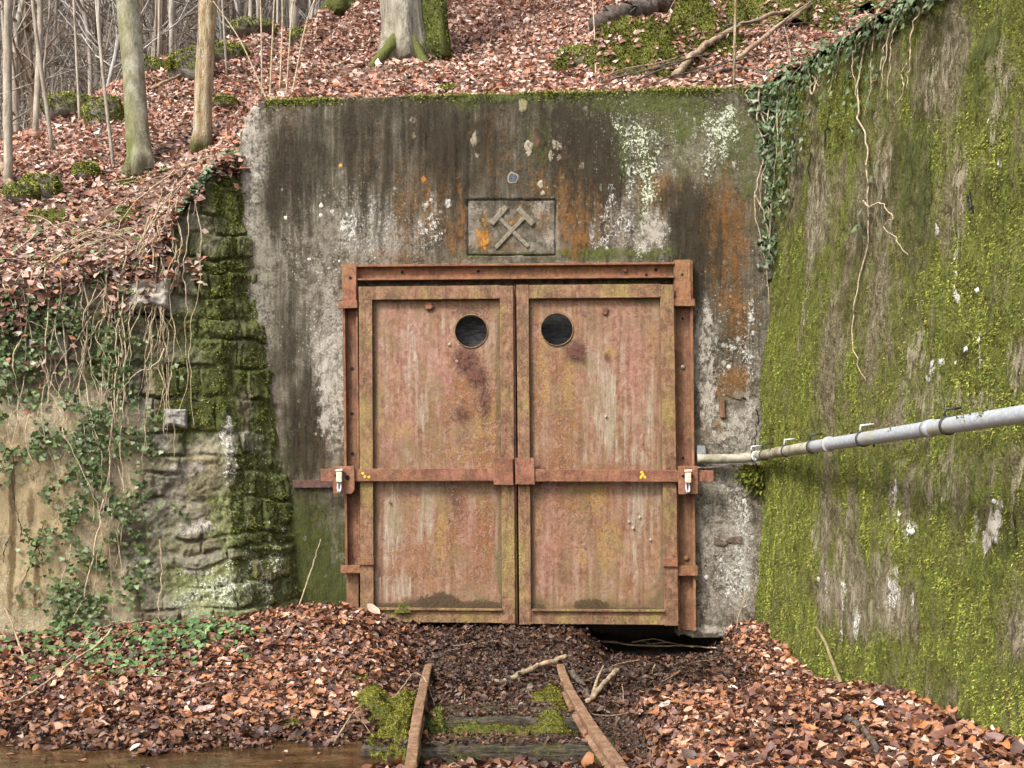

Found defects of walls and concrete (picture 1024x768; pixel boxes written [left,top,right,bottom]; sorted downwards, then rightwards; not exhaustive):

damp [263,115,324,240]
damp [281,334,345,563]
damp [339,83,753,377]
damp [729,298,756,385]